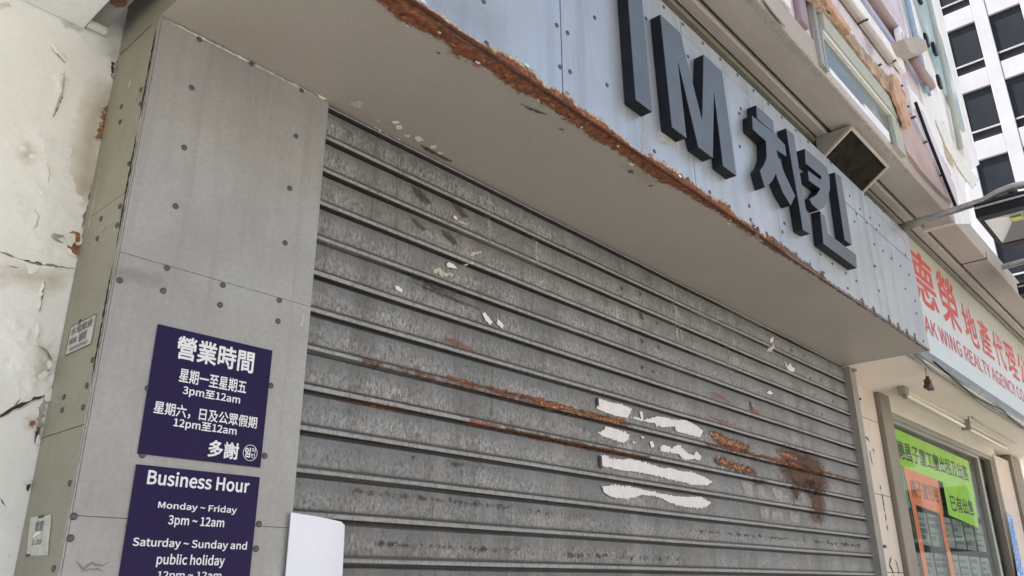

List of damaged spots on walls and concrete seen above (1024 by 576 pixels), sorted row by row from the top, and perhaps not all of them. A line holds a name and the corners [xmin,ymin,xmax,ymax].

peeling [50,44,67,117]
rust [372,0,929,351]
spalling [51,231,83,258]
crack [0,387,52,419]
rust [401,368,630,426]
rust [468,420,649,461]
rust [706,419,857,524]